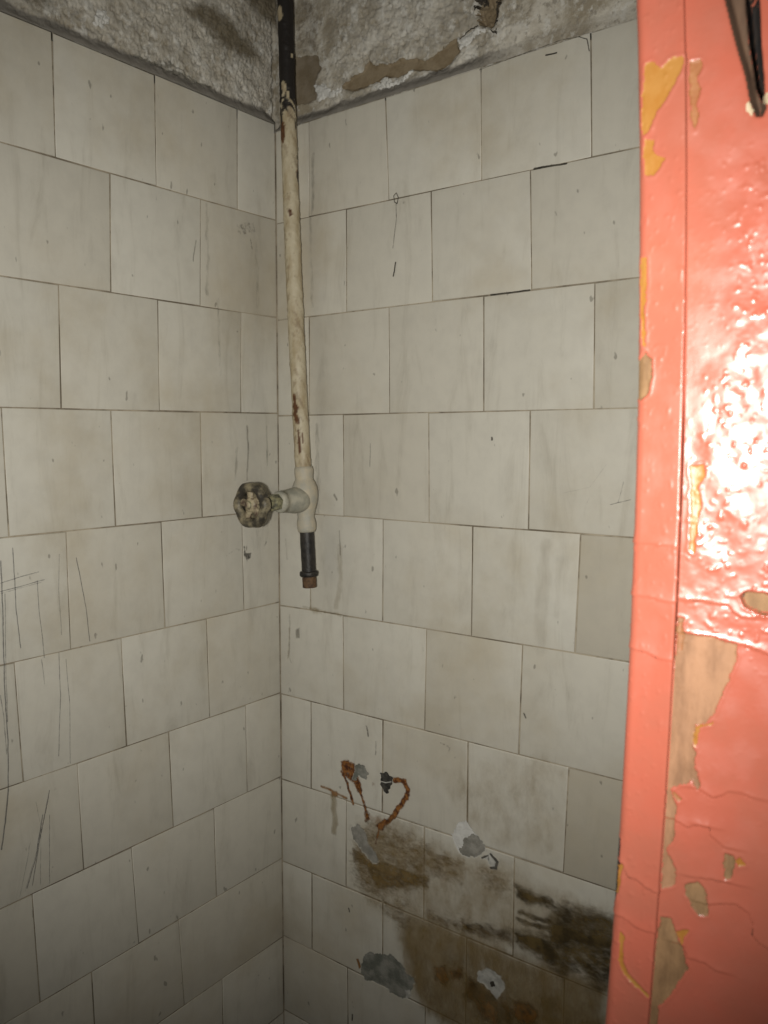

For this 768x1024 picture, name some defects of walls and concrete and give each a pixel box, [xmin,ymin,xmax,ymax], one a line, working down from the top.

peeling [295,0,503,106]
peeling [638,352,652,400]
rust [321,760,410,844]
peeling [661,617,738,917]
spalling [451,821,499,870]
spalling [361,952,416,999]
spalling [477,968,505,998]
water stain [407,886,613,1024]
peeling [650,917,688,1024]